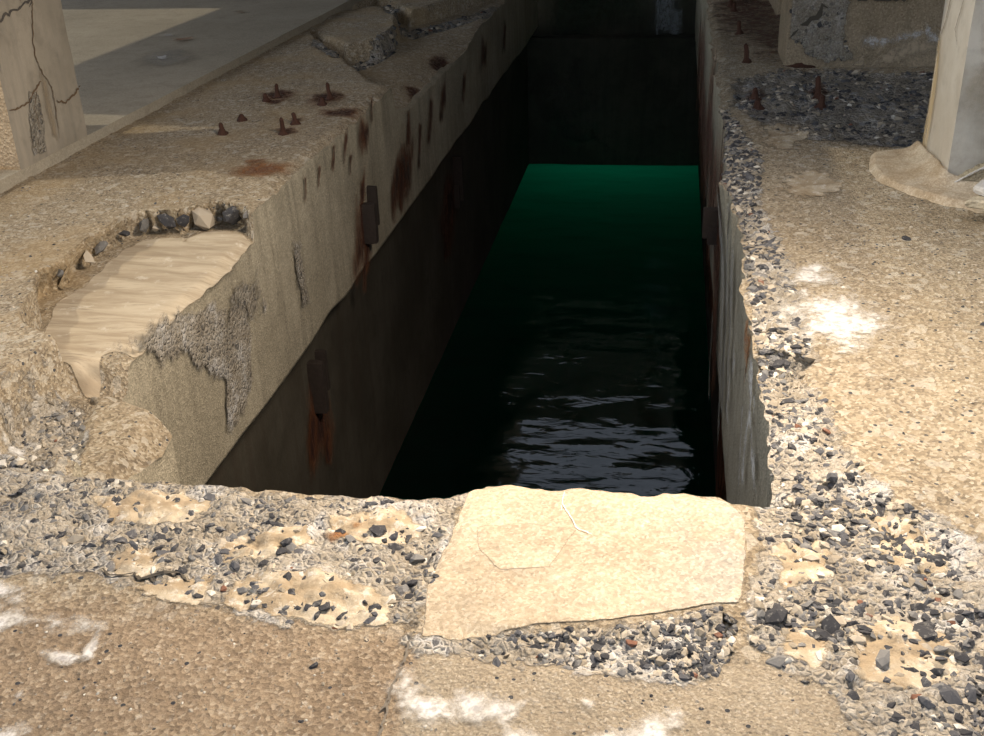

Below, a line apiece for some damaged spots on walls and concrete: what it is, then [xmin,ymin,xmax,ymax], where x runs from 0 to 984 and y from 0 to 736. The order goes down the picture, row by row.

crack [0,0,80,136]
rust [711,0,780,60]
crack [790,3,828,38]
rust [697,26,724,388]
spalling [0,0,594,631]
spalling [399,0,984,736]
rust [715,412,726,499]
leakage [0,581,31,632]
leakage [42,619,99,665]